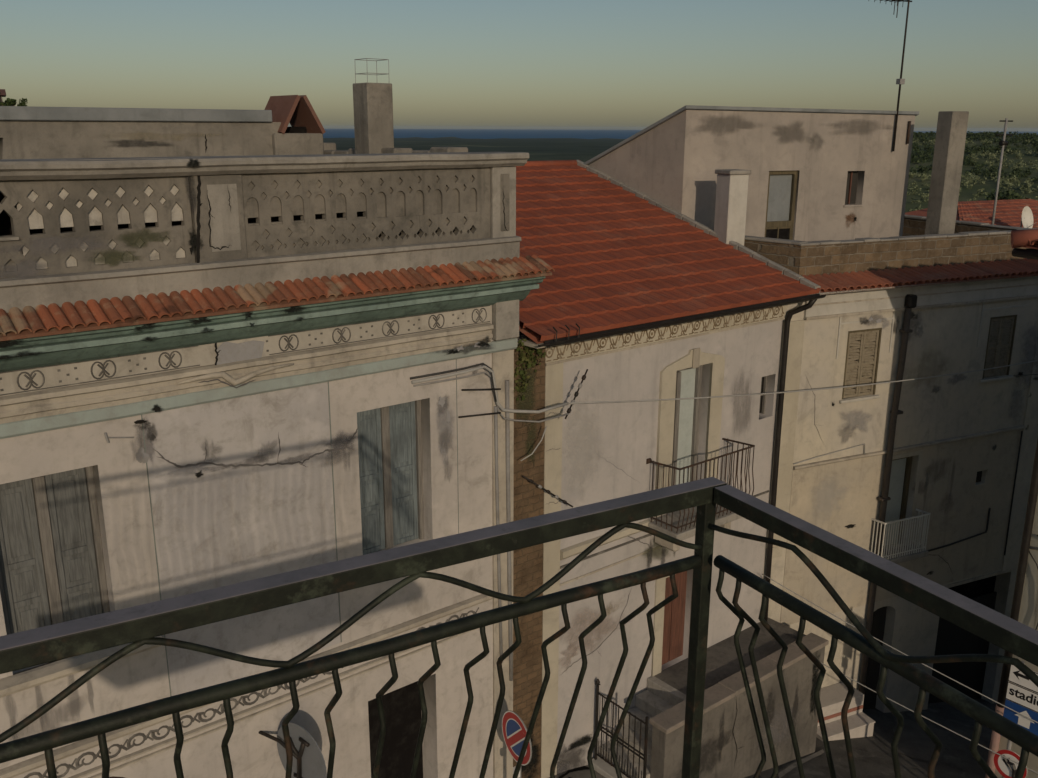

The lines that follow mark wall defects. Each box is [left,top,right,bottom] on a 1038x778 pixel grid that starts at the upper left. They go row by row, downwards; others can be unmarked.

crack [186,175,231,263]
spalling [134,407,160,463]
crack [151,427,359,468]